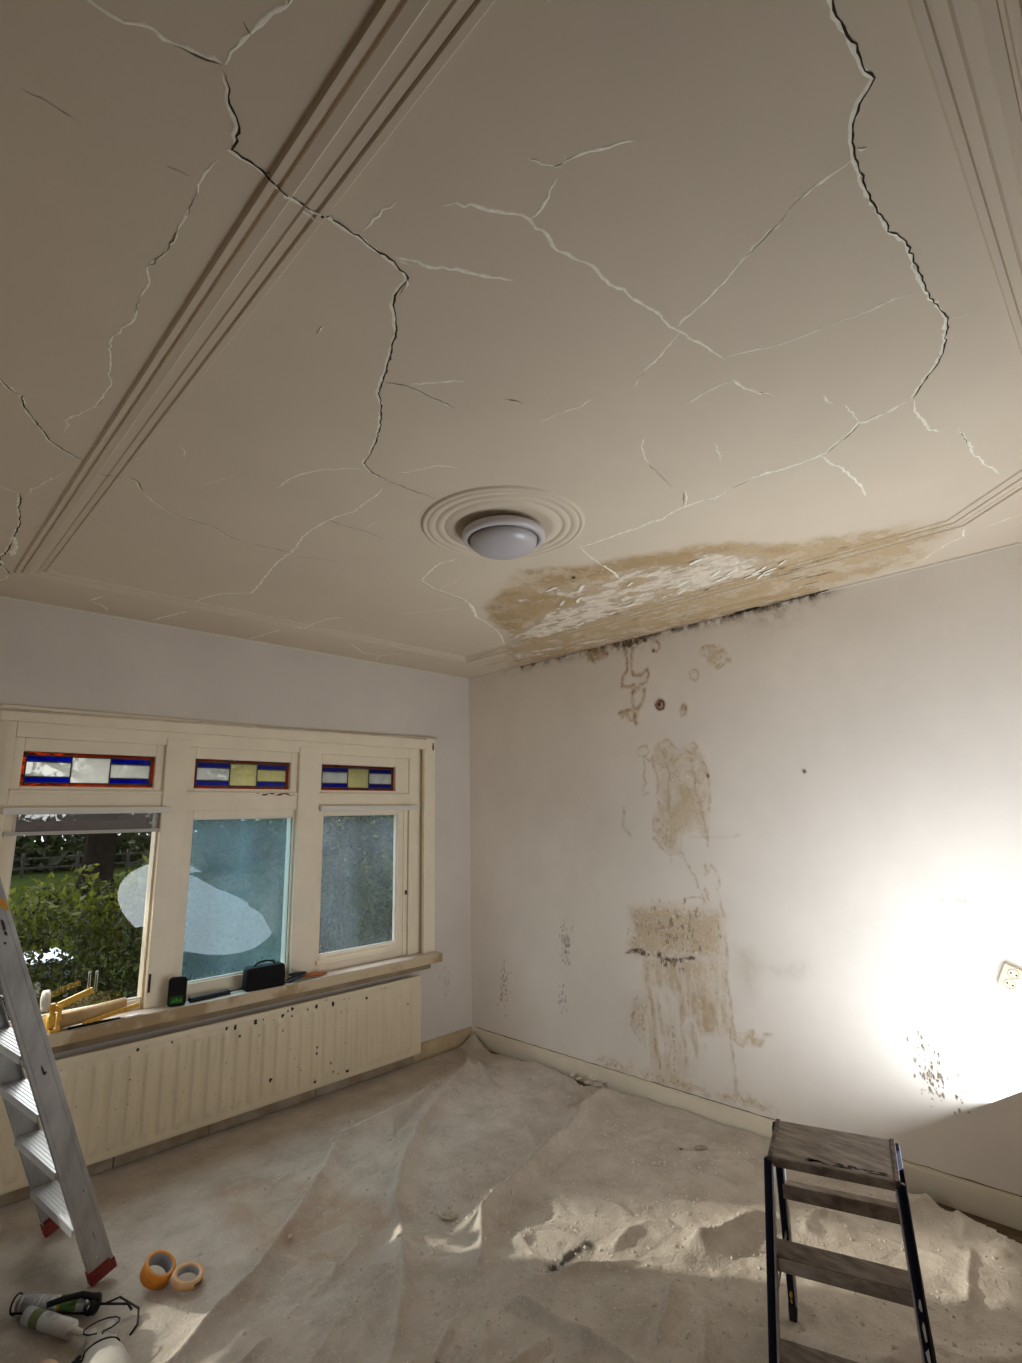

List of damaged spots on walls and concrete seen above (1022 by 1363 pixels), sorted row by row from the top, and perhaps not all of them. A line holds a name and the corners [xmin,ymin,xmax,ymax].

crack [0,0,513,620]
crack [442,0,1000,582]
crack [403,559,505,644]
peeling [510,553,787,659]
water stain [494,531,933,724]
water stain [628,901,724,1031]
water stain [907,1031,969,1114]